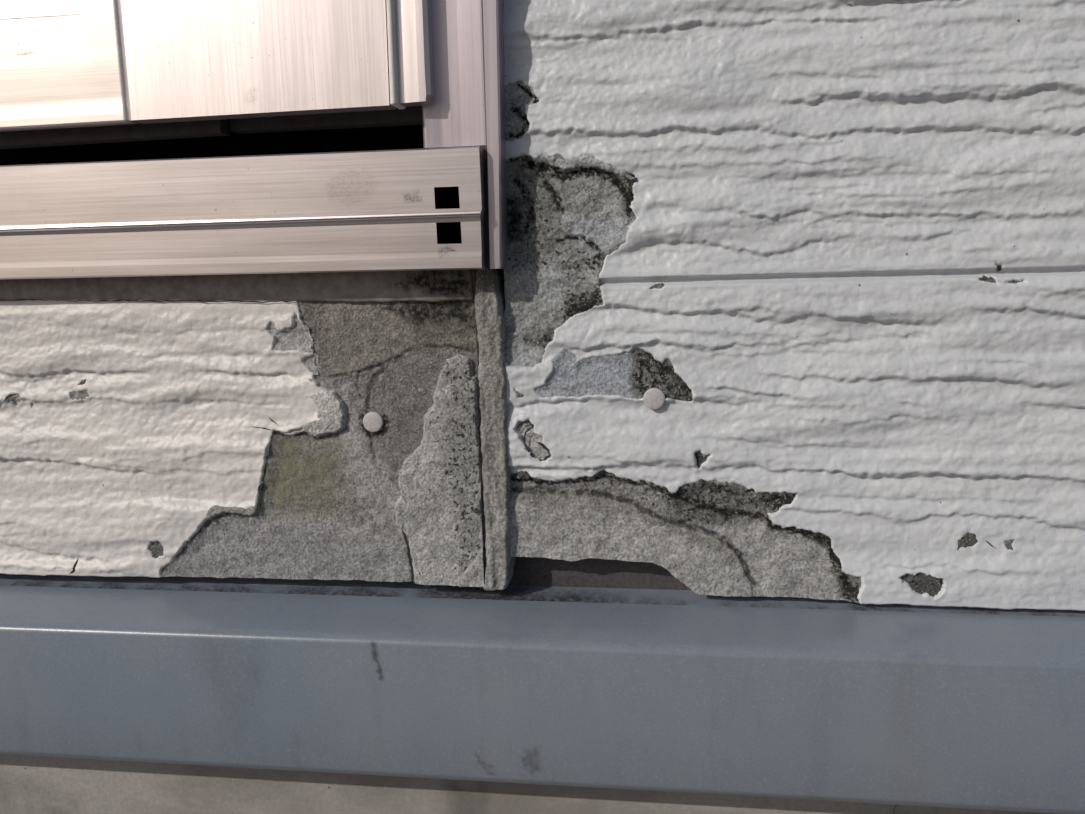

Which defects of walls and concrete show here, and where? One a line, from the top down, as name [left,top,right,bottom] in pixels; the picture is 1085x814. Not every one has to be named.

spalling [505,80,539,141]
spalling [503,153,692,401]
peeling [148,269,485,587]
peeling [515,420,551,462]
spalling [509,451,861,603]
peeling [957,532,978,550]
peeling [901,573,943,597]